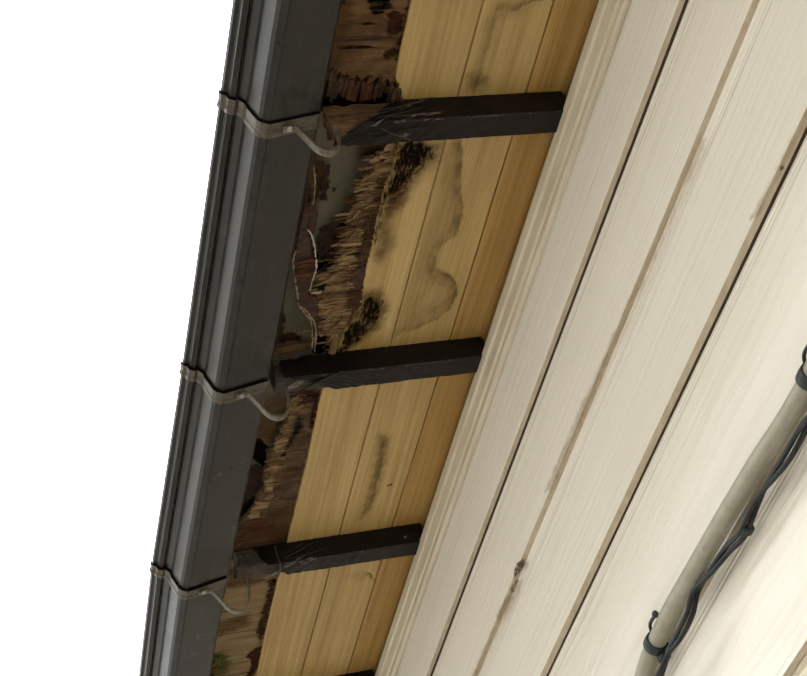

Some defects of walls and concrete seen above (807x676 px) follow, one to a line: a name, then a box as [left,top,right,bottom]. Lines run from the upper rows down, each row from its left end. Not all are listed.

leakage [331,0,394,67]
leakage [374,141,433,258]
peeling [348,264,367,300]
leakage [367,441,386,509]